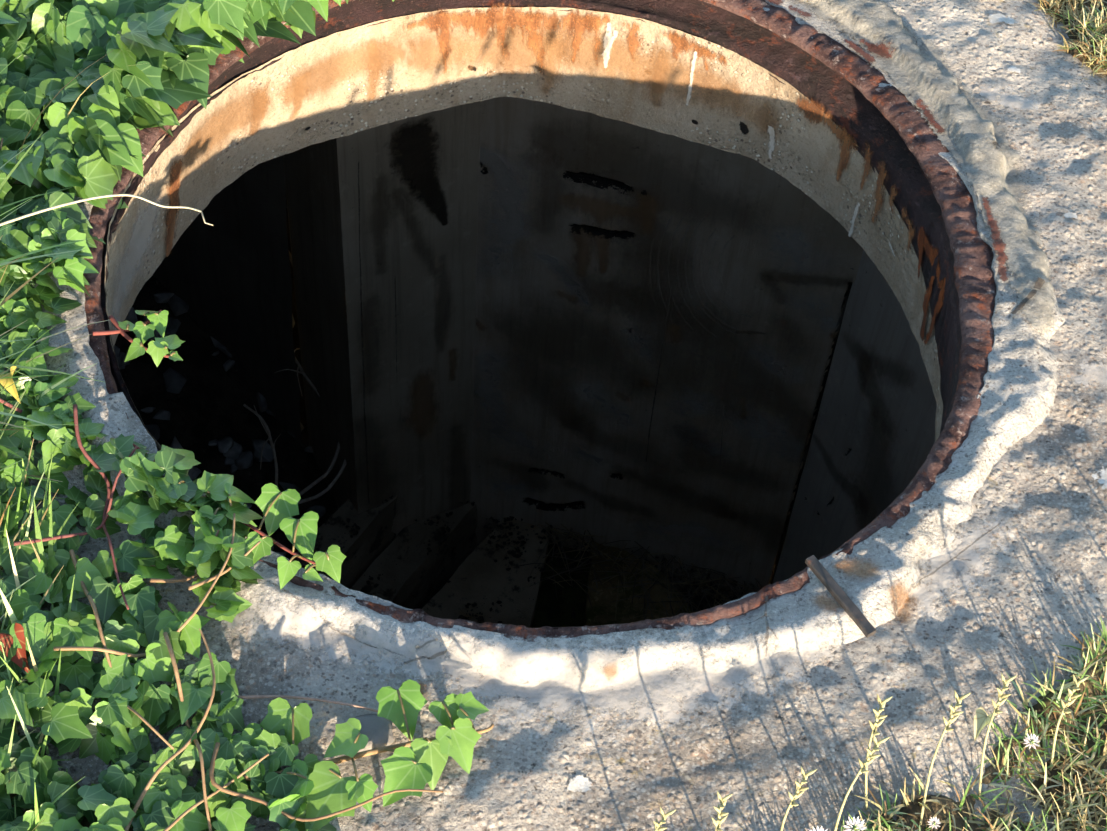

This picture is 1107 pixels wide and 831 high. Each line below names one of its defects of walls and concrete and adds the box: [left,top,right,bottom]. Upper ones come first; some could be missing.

rust [285,42,402,119]
rust [403,4,771,130]
rust [768,0,811,18]
rust [845,39,894,63]
rust [165,92,269,258]
water stain [390,118,448,226]
water stain [768,125,776,159]
rust [797,98,946,344]
rust [982,197,1008,282]
rust [893,586,911,621]